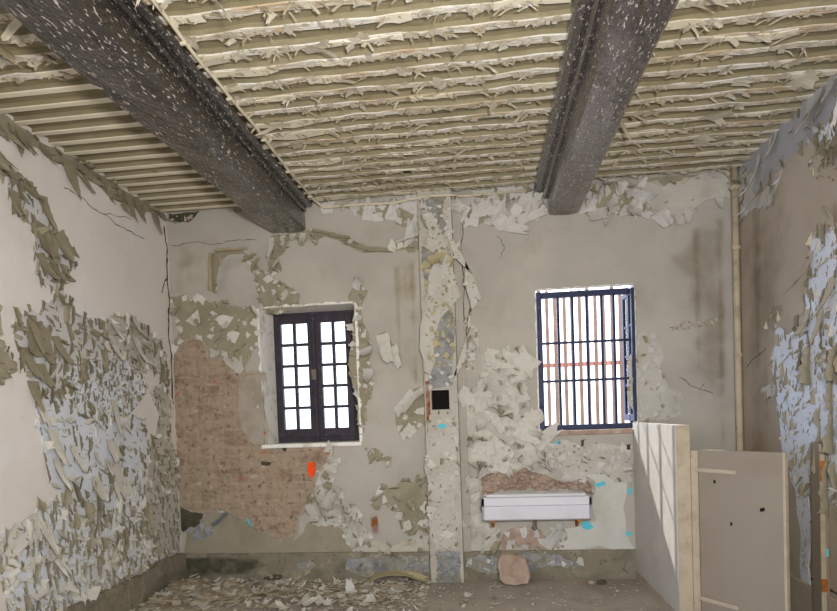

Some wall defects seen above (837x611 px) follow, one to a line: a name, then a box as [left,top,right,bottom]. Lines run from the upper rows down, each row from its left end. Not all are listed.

crack [64,187,144,239]
crack [161,226,255,404]
flaking render [0,0,634,611]
peeling [580,0,837,230]